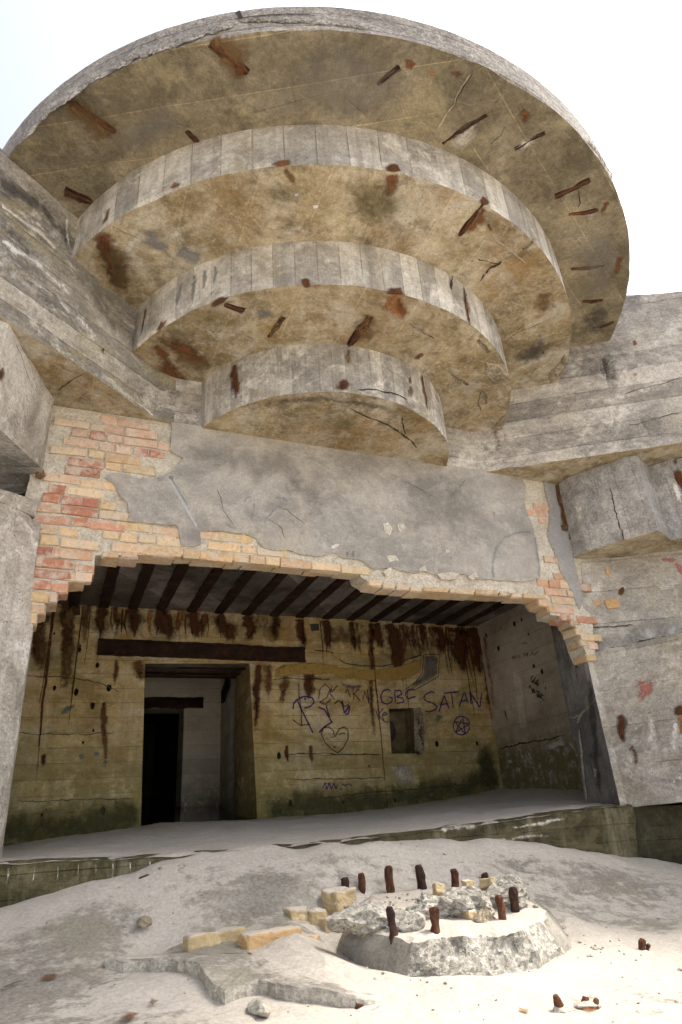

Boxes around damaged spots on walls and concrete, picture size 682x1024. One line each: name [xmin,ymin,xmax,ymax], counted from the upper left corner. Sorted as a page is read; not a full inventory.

rust [210,35,249,75]
rust [442,114,487,145]
rust [514,131,545,151]
rust [555,178,590,198]
rust [459,197,491,237]
rust [94,209,129,288]
rust [346,315,374,363]
crack [295,367,482,448]
flaking render [30,414,369,615]
crack [610,489,624,540]
flaking render [524,485,603,655]
rust [617,715,637,763]